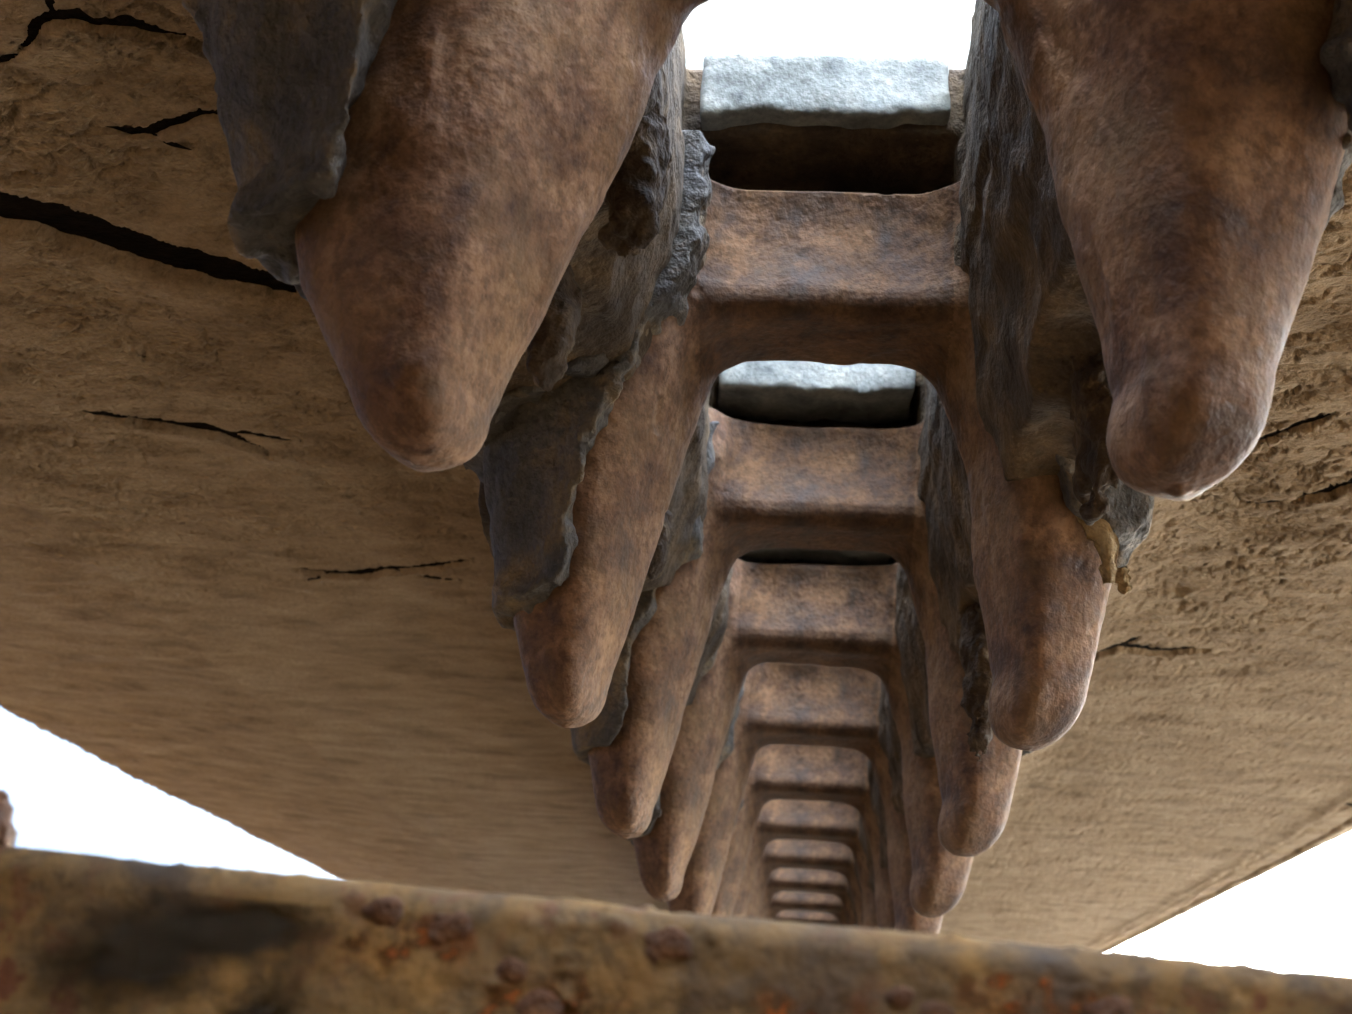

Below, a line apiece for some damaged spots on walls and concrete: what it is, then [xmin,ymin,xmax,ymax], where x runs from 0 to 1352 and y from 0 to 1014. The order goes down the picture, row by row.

crack [0,0,199,63]
crack [105,108,218,150]
crack [0,192,297,293]
crack [82,410,291,448]
crack [1246,478,1352,503]
crack [303,558,474,581]
crack [1096,636,1195,654]
corrosion [346,896,474,967]
corrosion [644,926,692,964]
corrosion [496,957,564,1014]